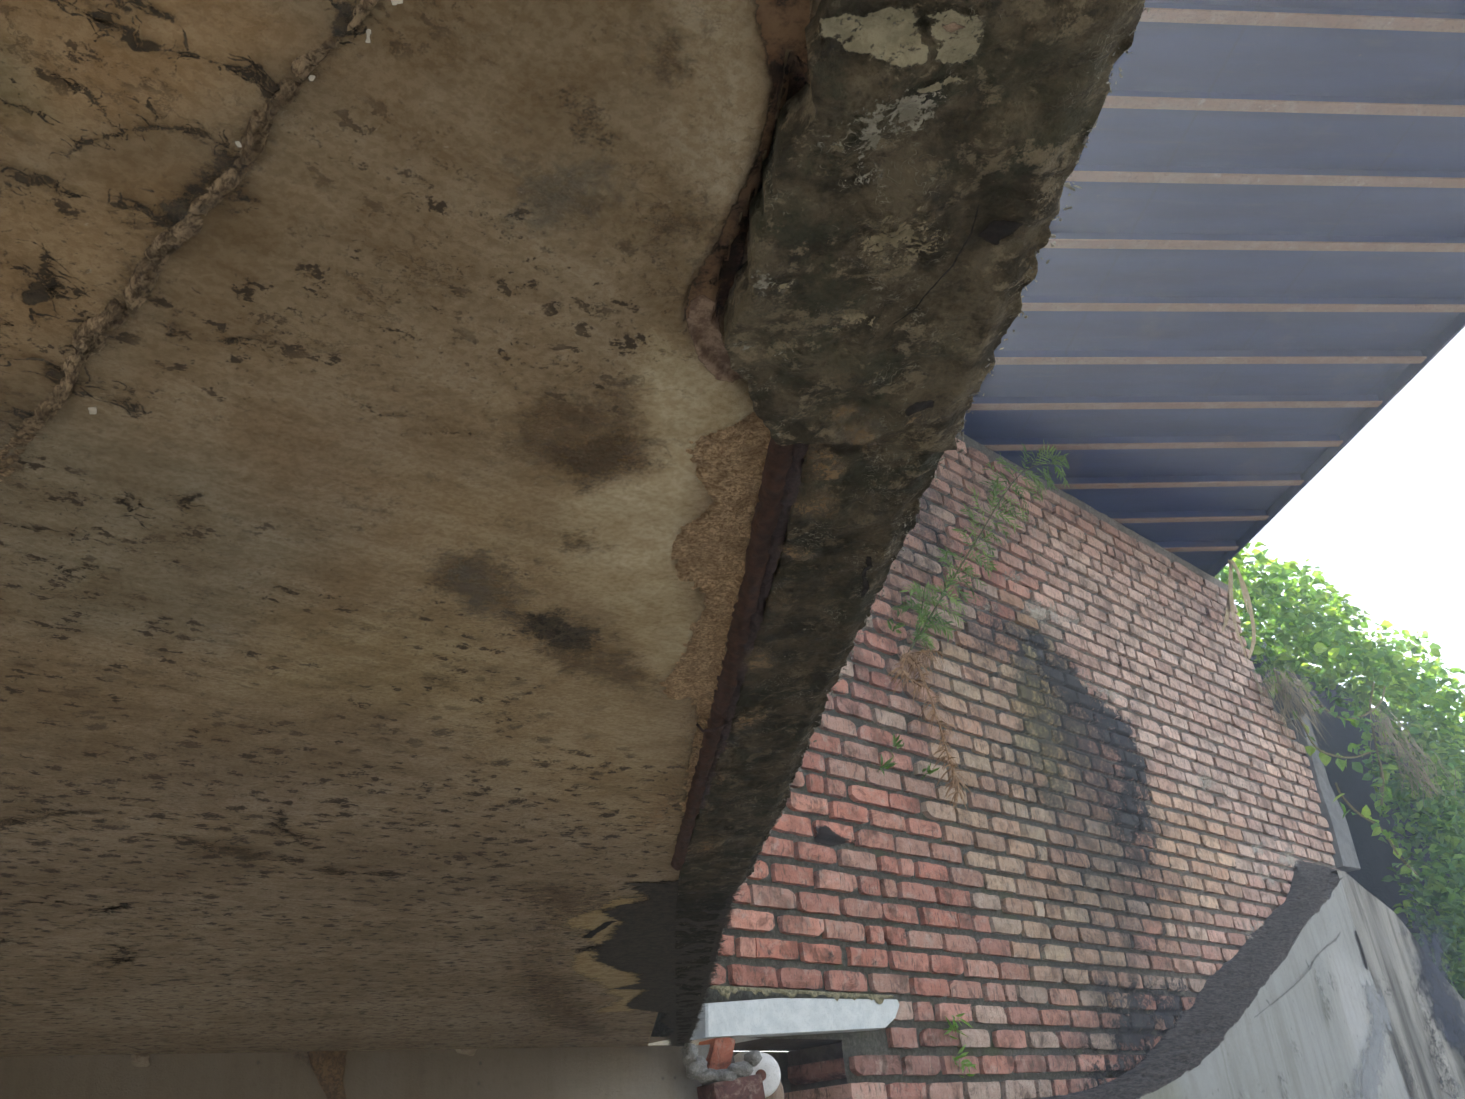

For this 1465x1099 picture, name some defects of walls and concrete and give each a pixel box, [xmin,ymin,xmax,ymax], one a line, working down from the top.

peeling [816,7,984,184]
crack [0,0,403,482]
peeling [853,204,948,270]
crack [3,523,99,580]
crack [121,492,203,527]
water stain [436,552,641,689]
spalling [629,412,778,829]
rust [671,438,809,871]
peeling [728,498,921,907]
water stain [964,592,1153,871]
water stain [513,836,767,1047]
water stain [1078,977,1194,1091]